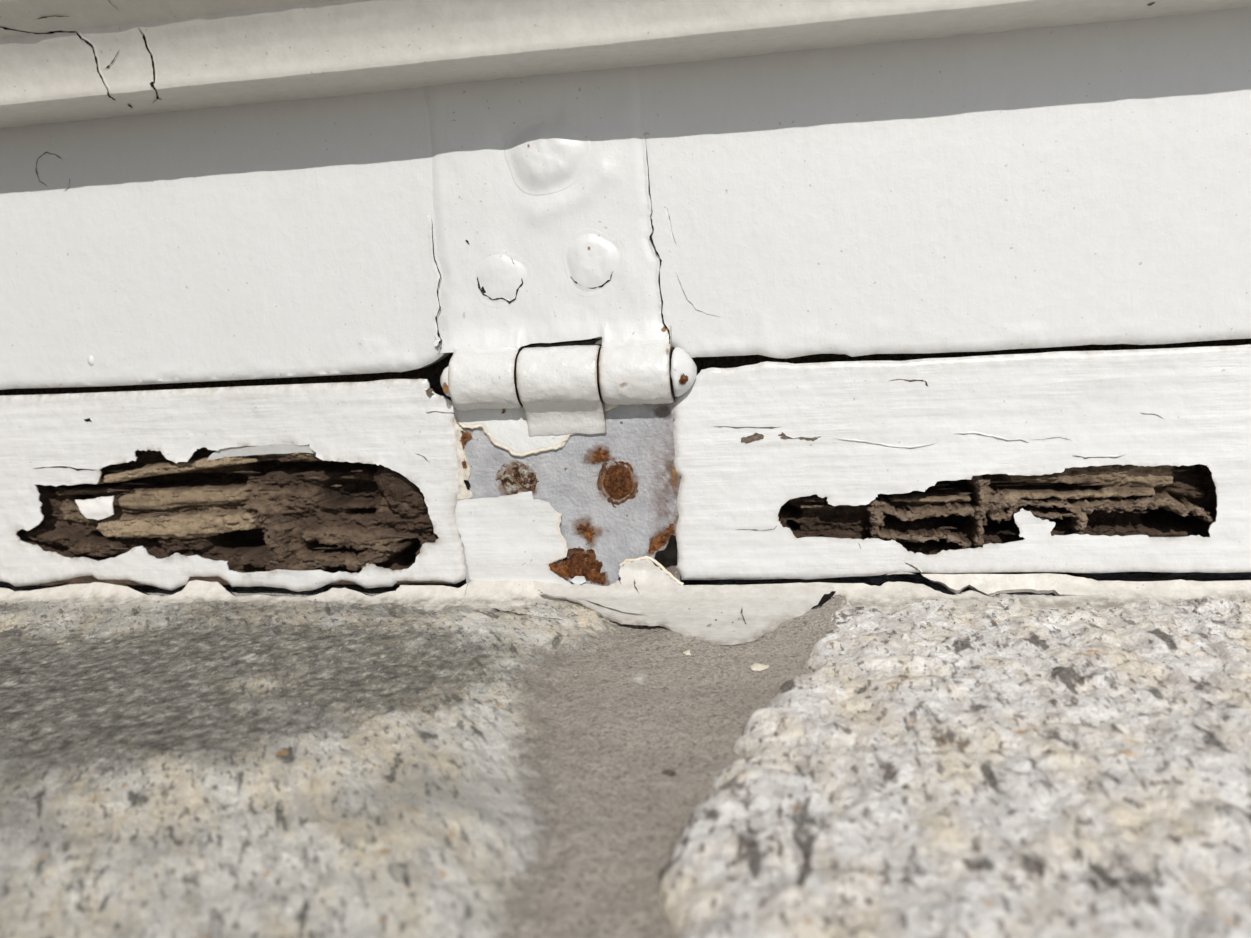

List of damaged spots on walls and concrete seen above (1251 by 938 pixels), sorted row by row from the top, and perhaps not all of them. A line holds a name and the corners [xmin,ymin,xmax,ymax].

crack [0,16,163,109]
crack [641,129,718,344]
rust [460,426,481,468]
rust [585,446,612,464]
rust [499,462,535,495]
peeling [75,496,114,520]
rust [548,519,609,585]
peeling [425,388,836,655]
rust [647,524,675,554]